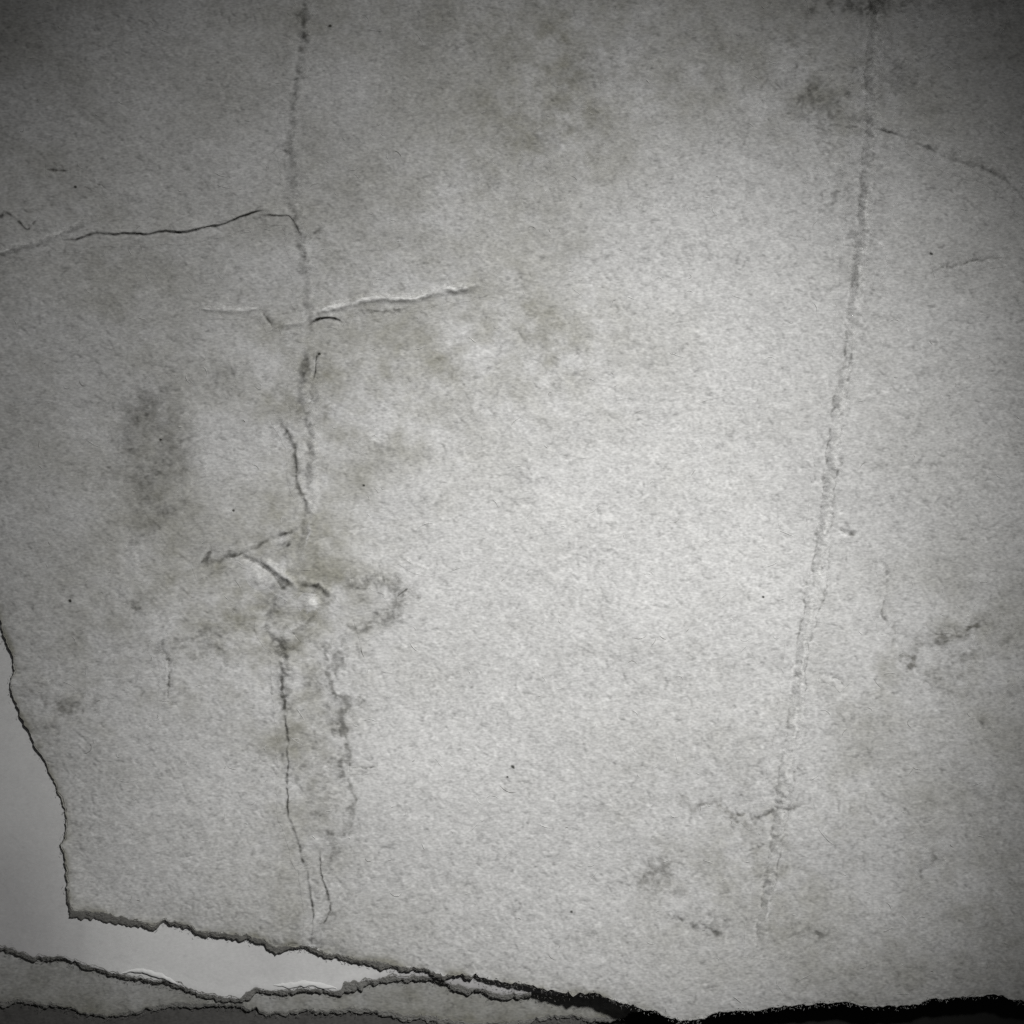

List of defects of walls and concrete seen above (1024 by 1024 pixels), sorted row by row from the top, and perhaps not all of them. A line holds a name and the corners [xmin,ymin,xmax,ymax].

crack [56,197,312,253]
peeling [121,968,177,984]
peeling [274,980,337,989]